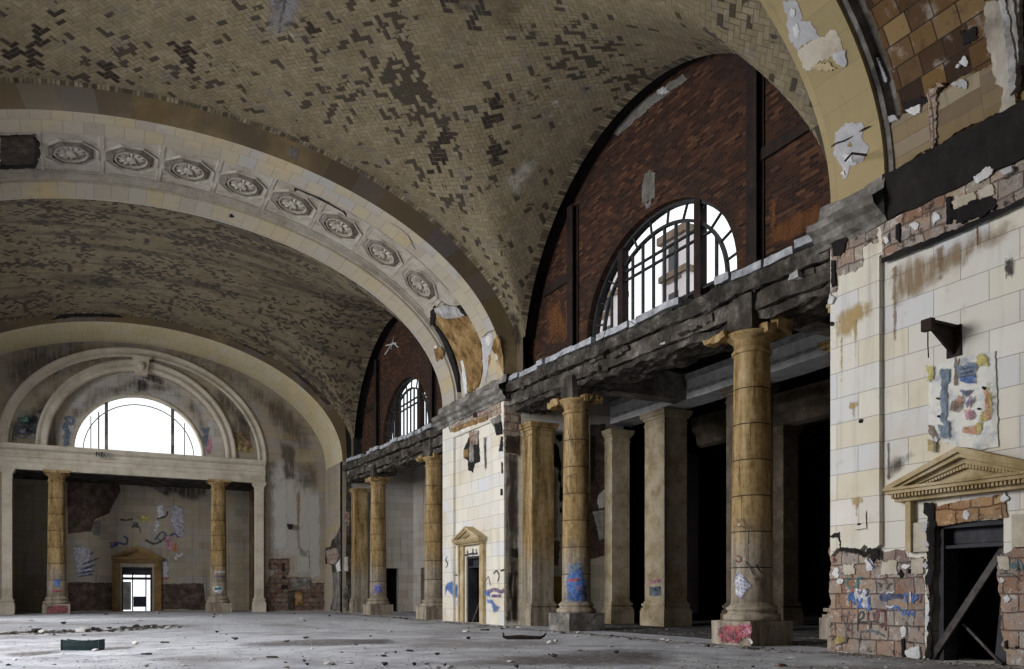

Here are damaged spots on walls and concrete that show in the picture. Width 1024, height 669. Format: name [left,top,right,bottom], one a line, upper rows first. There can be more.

peeling [782,0,848,71]
spalling [613,74,688,136]
spalling [0,137,41,170]
spalling [828,64,1024,305]
spalling [430,304,504,396]
spalling [67,482,120,536]
spalling [265,479,351,611]
spalling [828,492,1009,659]